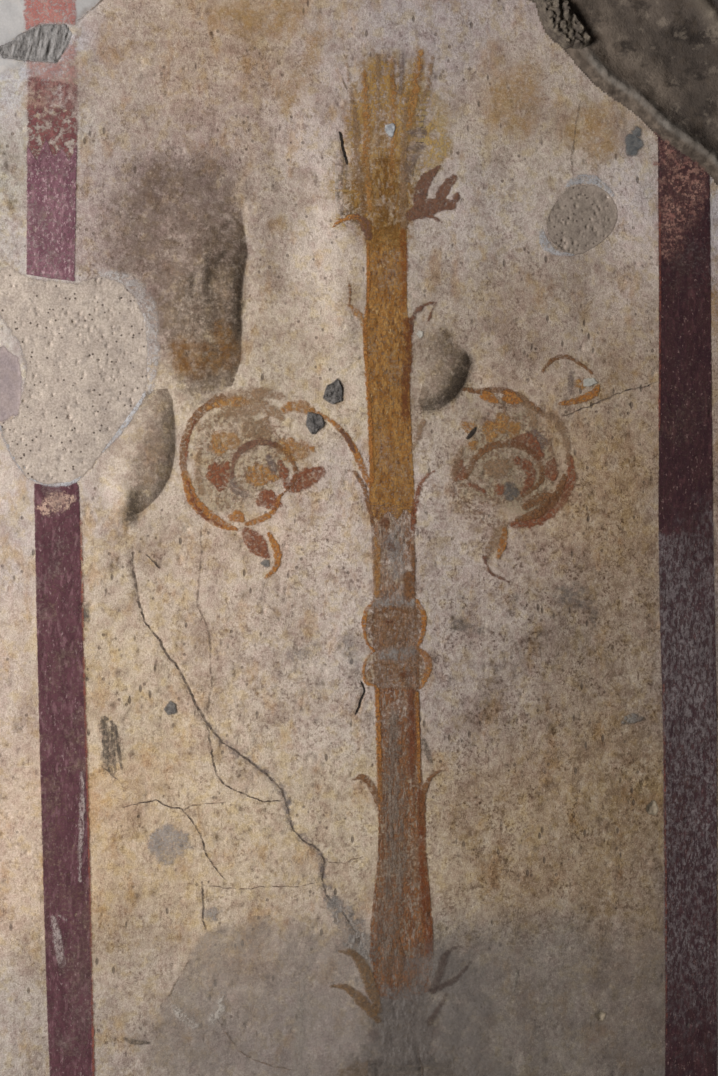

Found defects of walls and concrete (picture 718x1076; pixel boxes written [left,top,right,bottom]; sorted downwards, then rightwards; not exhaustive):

spalling [0,24,72,63]
flaking render [533,0,594,49]
spalling [625,127,643,156]
peeling [653,140,707,258]
crack [102,531,363,947]